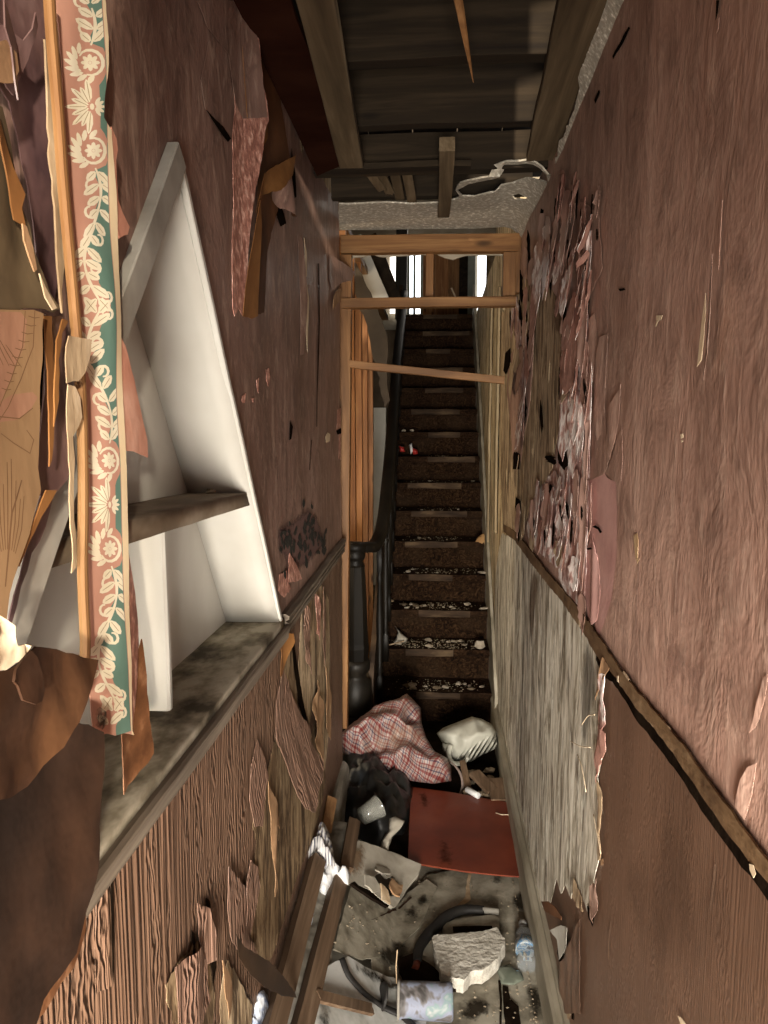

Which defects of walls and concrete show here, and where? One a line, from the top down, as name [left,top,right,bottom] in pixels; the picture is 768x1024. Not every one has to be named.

peeling [0,106,60,313]
leakage [278,500,327,579]
flaking render [494,170,623,927]
peeling [280,633,295,677]
flaking render [165,940,215,1024]